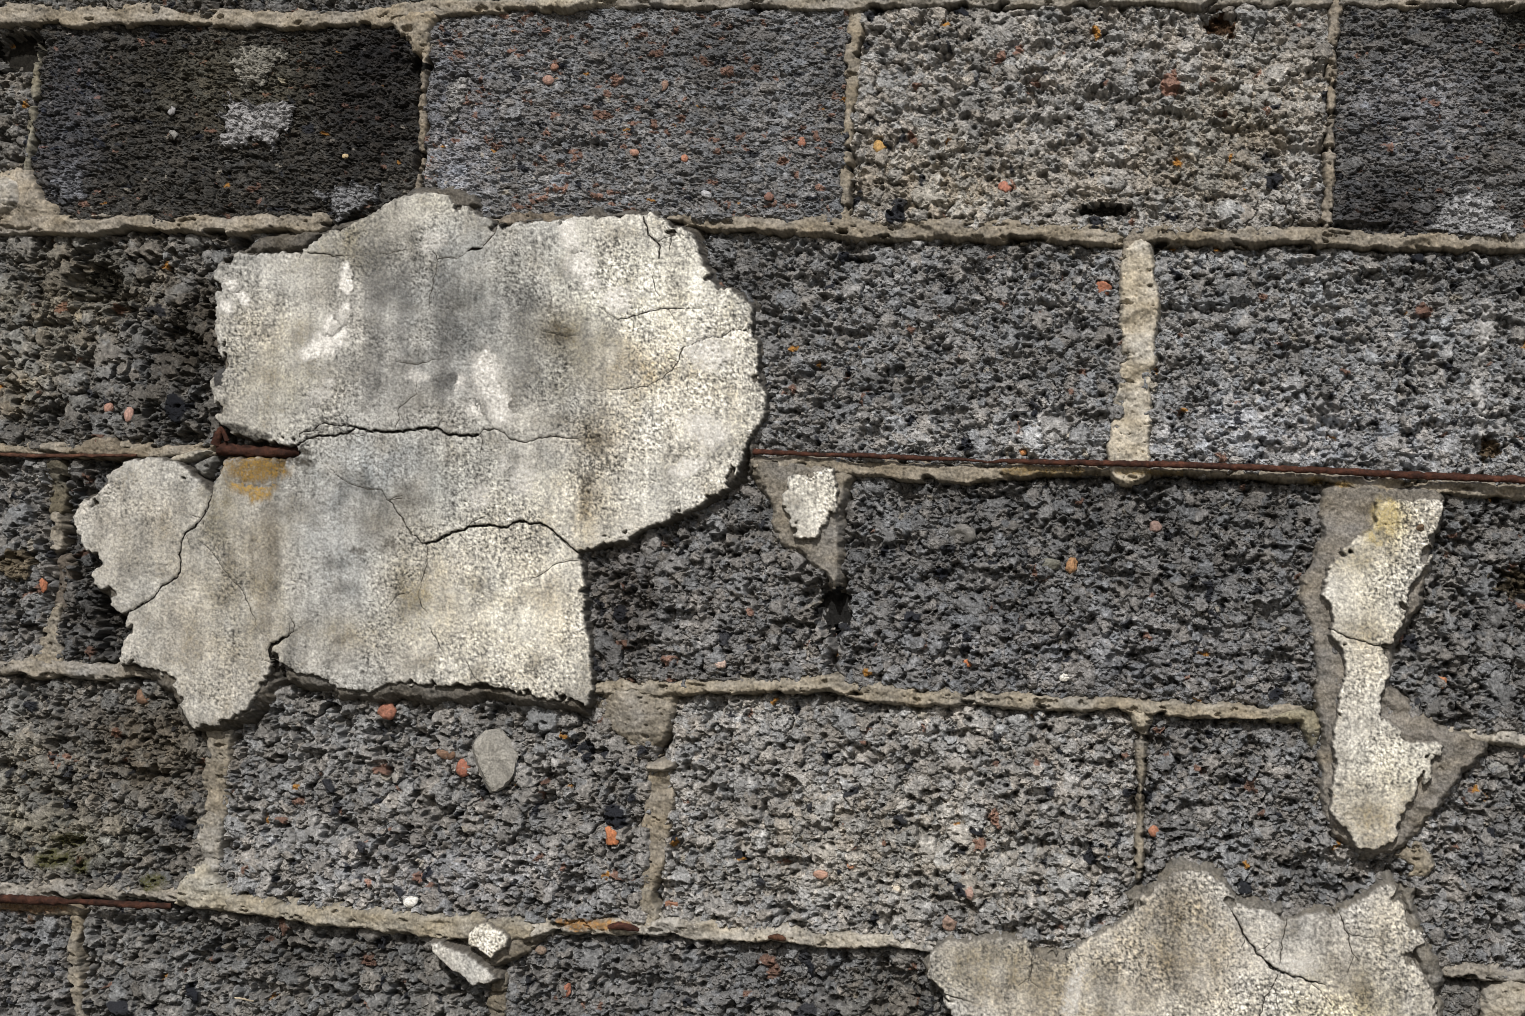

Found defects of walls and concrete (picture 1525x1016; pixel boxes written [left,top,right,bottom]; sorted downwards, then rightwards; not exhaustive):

spalling [1198,9,1236,39]
spalling [1079,202,1139,217]
crack [299,228,497,304]
crack [580,216,756,395]
rust [210,426,301,502]
rust [752,448,1525,487]
crack [297,359,598,682]
crack [127,495,295,672]
spalling [813,582,853,634]
rust [0,894,173,917]
peeling [431,918,512,986]
crack [1229,907,1368,1016]